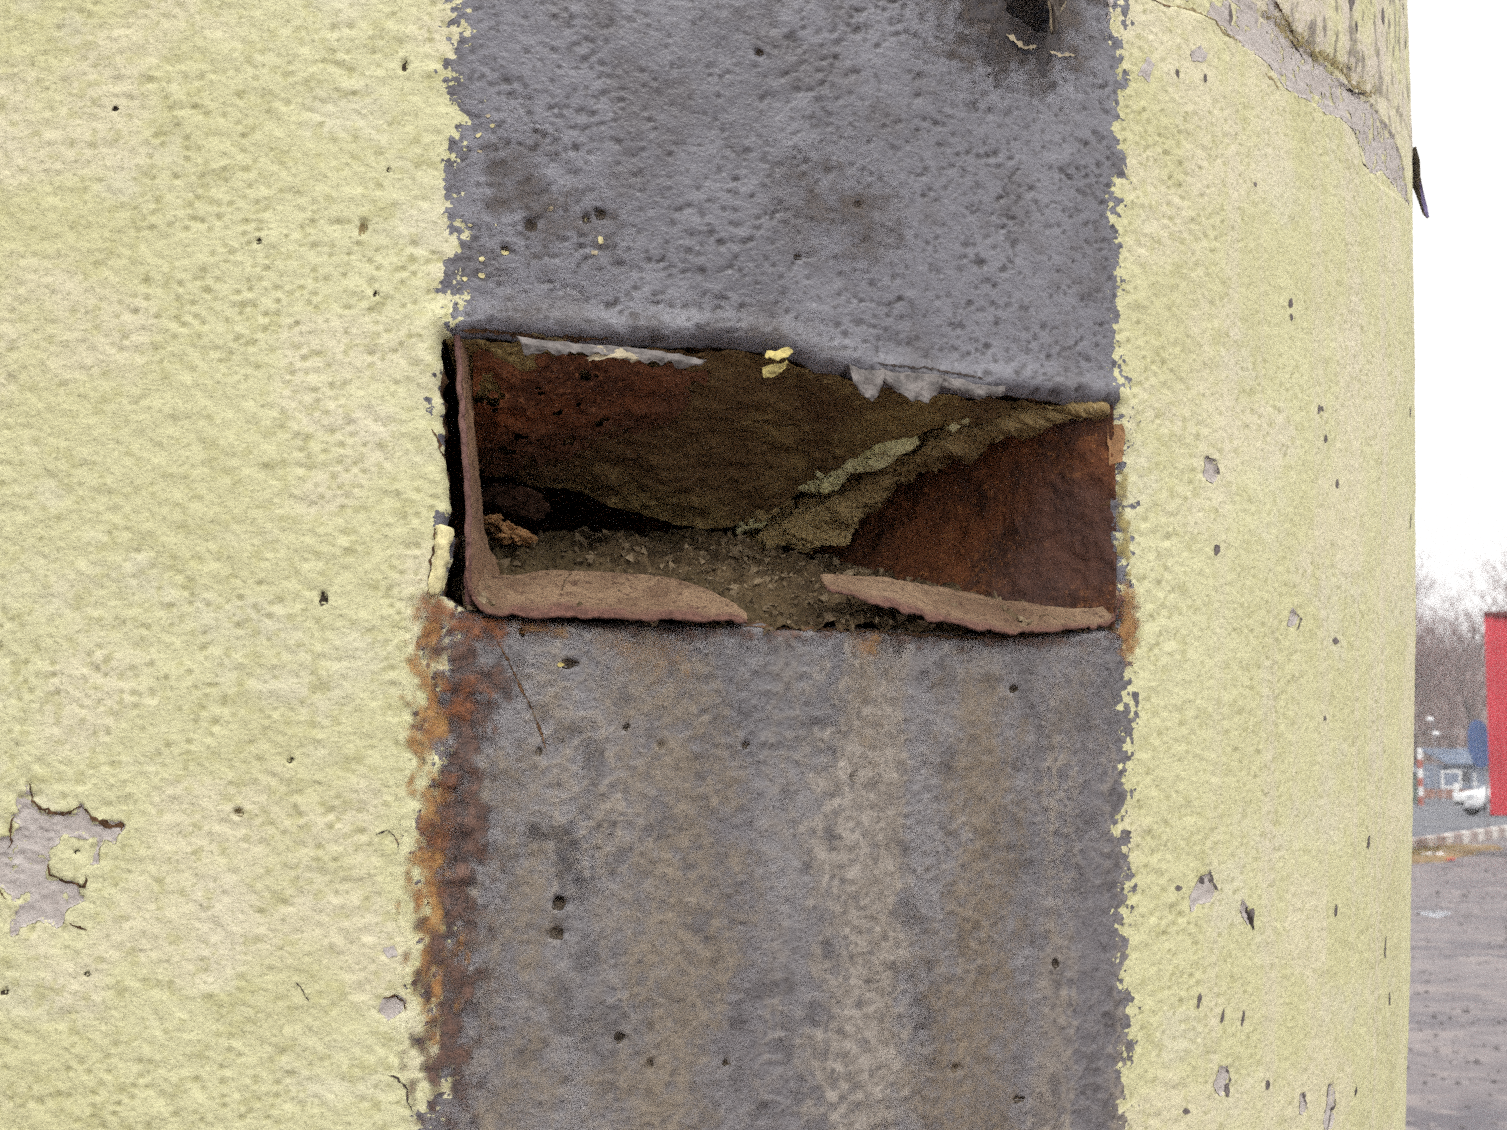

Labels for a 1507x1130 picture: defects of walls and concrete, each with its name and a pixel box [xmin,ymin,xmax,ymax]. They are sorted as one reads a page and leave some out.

peeling [1176,45,1208,82]
crack [1155,0,1377,169]
peeling [1207,0,1429,218]
peeling [516,336,706,369]
peeling [762,347,793,378]
peeling [849,364,1006,404]
peeling [1107,424,1125,465]
rust [481,482,551,548]
peeling [428,524,455,595]
peeling [0,779,125,937]
rust [408,597,562,1110]